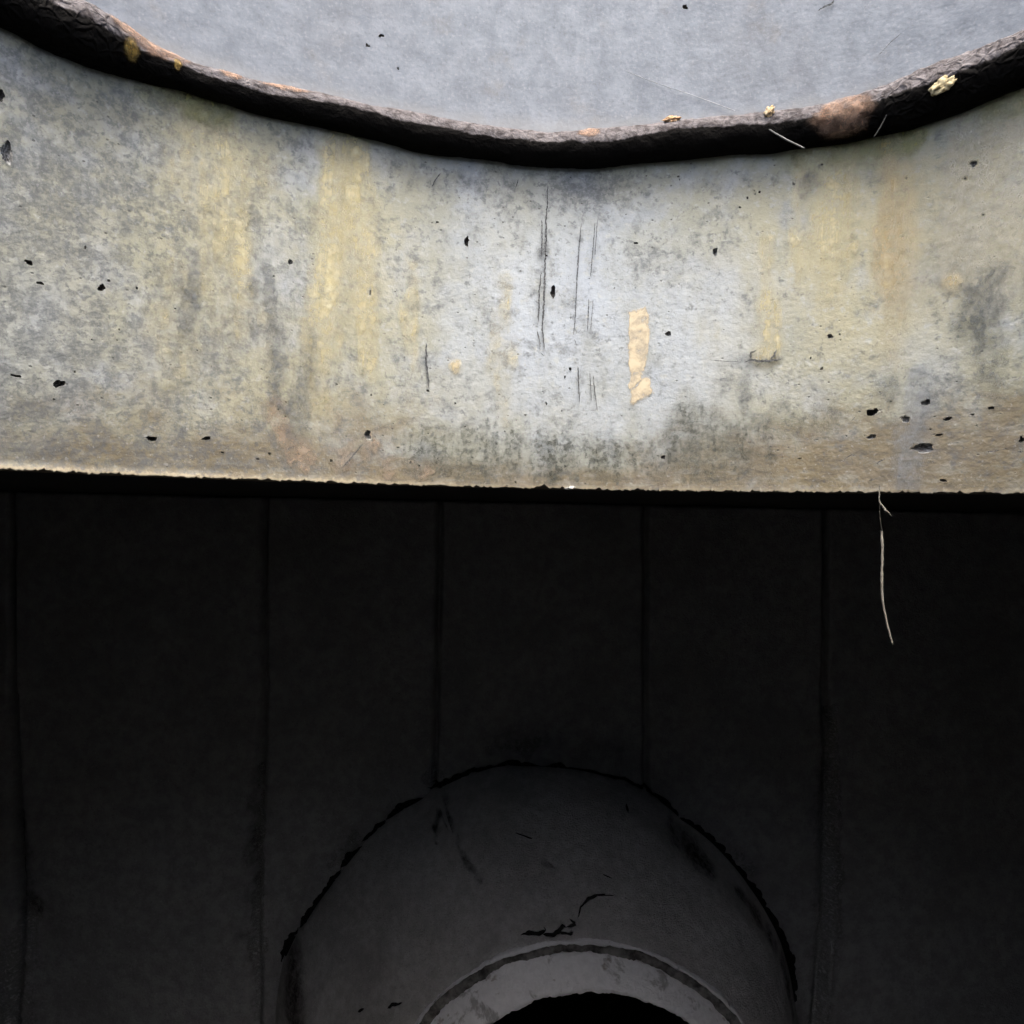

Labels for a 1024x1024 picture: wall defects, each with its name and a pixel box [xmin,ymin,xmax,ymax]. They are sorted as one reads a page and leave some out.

rust [818,96,870,138]
peeling [628,307,652,404]
crack [280,760,798,1002]